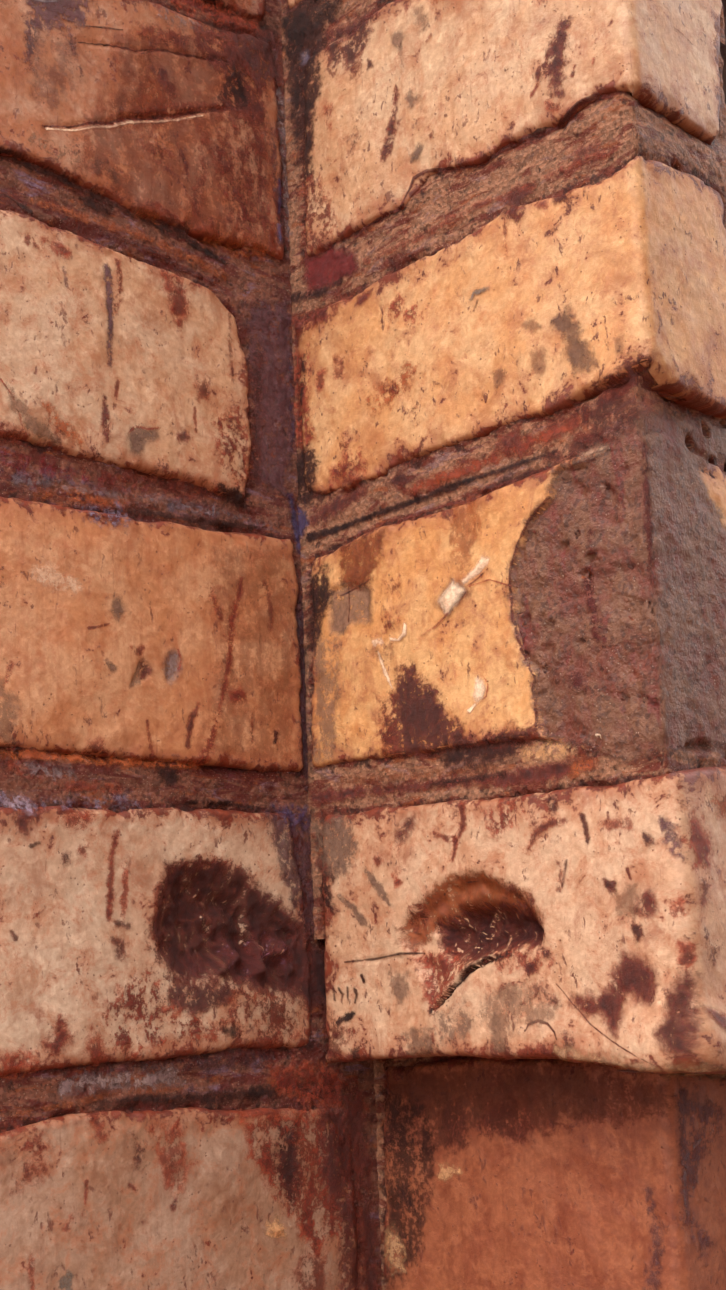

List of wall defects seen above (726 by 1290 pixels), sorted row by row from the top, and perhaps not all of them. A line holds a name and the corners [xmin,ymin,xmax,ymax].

corrosion [530,16,576,111]
crack [42,102,224,131]
leakage [523,743,567,759]